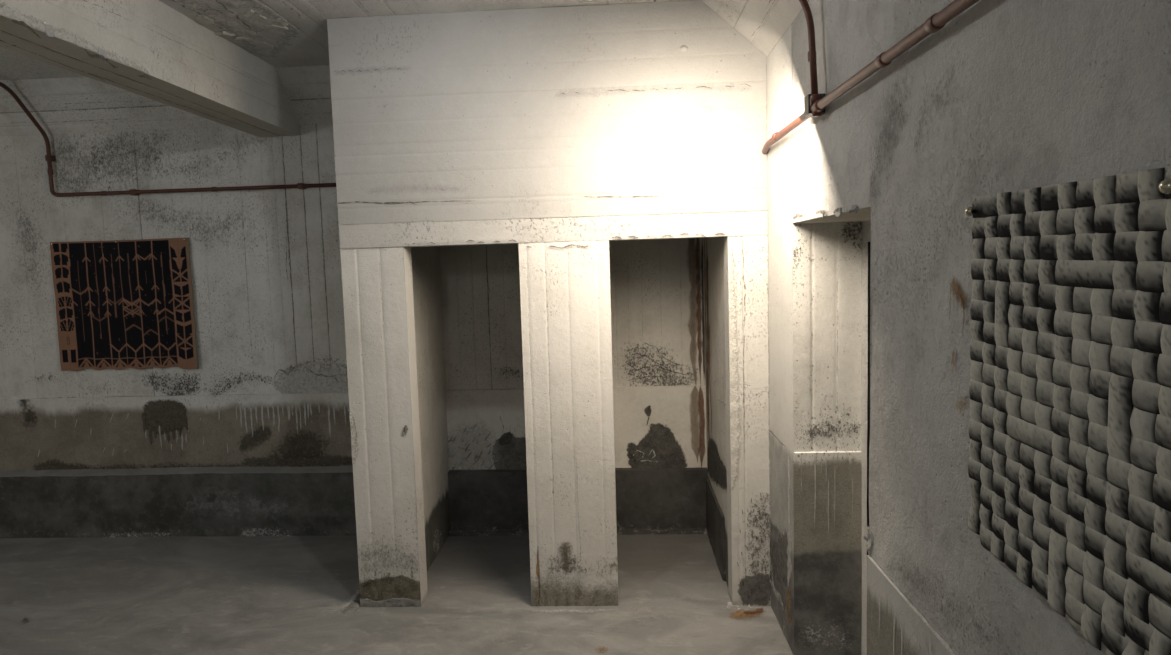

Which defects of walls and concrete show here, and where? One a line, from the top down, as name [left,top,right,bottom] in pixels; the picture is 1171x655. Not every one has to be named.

corrosion [949,277,966,333]
corrosion [688,238,712,468]
damp [20,399,37,423]
damp [35,402,352,470]
damp [142,368,272,450]
damp [492,432,527,470]
damp [627,423,688,468]
damp [707,438,727,488]
damp [803,407,860,440]
damp [325,545,421,614]
damp [736,493,792,610]